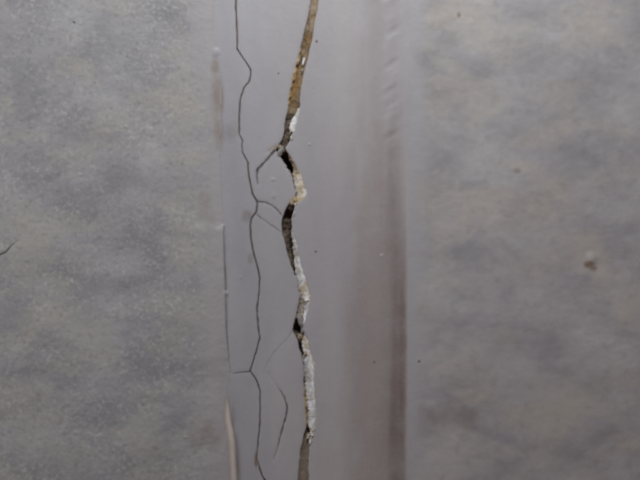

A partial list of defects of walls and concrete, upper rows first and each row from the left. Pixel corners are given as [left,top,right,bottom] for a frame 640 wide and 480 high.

crack [235,0,318,480]